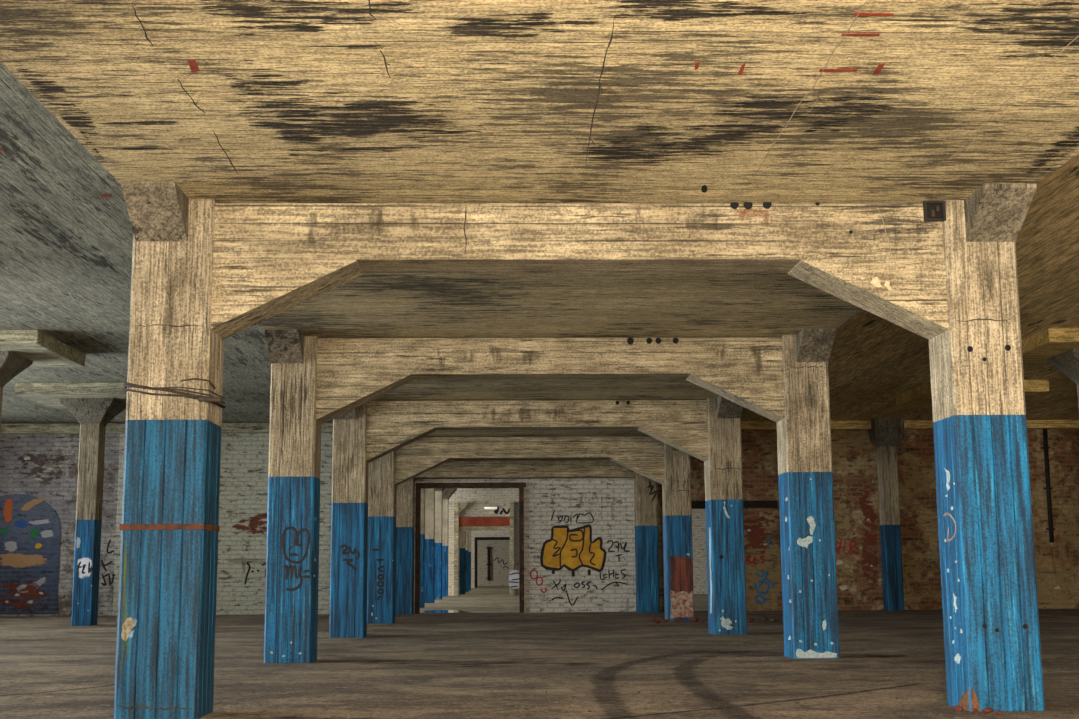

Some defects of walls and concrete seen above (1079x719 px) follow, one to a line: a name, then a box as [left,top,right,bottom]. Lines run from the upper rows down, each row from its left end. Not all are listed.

damp [202,0,419,49]
damp [412,0,831,41]
damp [221,56,481,156]
damp [564,91,891,166]
crack [749,0,868,182]
rust [119,523,220,532]
peeling [789,516,821,551]
flaking render [828,476,879,597]
peeling [670,553,693,618]
peeling [709,527,737,631]
peeling [788,635,837,658]